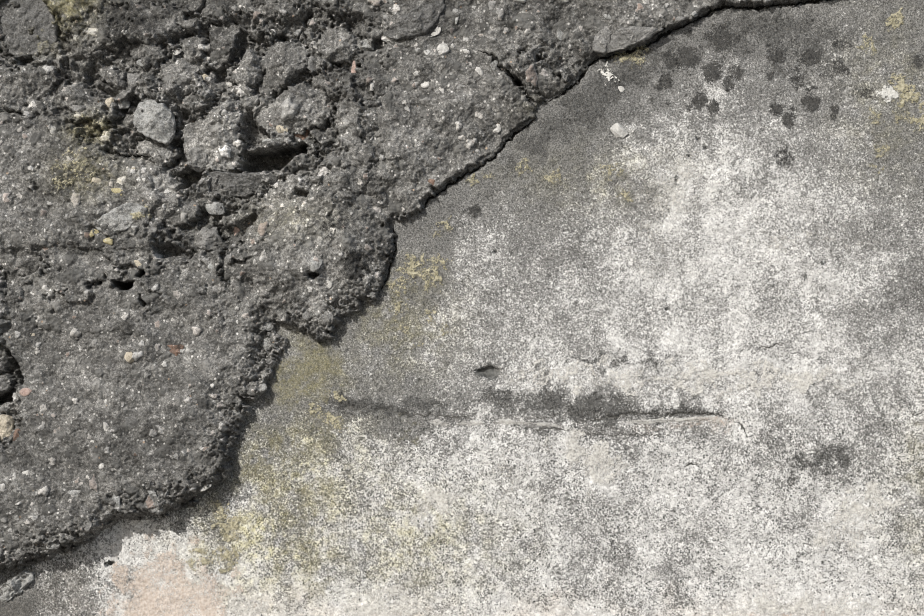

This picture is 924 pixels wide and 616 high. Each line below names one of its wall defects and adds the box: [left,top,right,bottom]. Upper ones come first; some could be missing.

spalling [0,0,391,264]
spalling [503,37,595,101]
crack [419,0,830,212]
damp [508,5,852,169]
spalling [0,337,32,451]
spalling [219,299,288,460]
crack [331,405,471,419]
peeling [429,419,484,427]
peeling [473,362,502,380]
crack [505,412,747,437]
peeling [626,416,728,425]